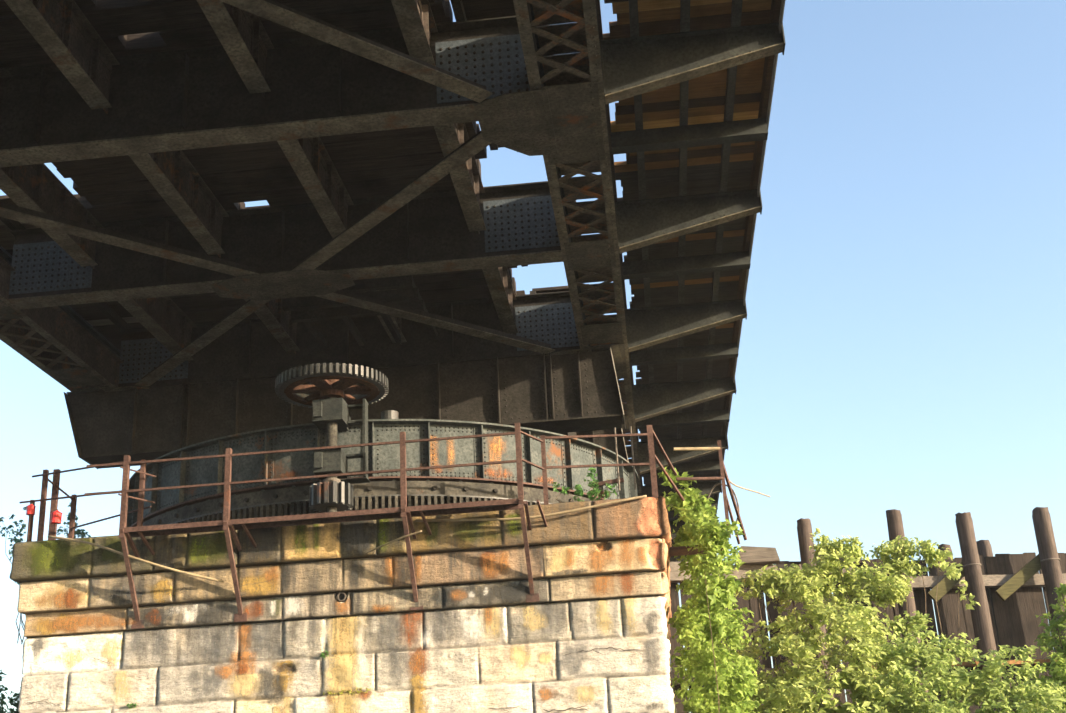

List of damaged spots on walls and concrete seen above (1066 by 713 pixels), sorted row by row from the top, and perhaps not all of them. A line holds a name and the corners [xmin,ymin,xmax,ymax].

corrosion [35,584,130,635]
corrosion [102,640,127,702]
corrosion [150,579,176,625]
corrosion [215,568,277,696]
corrosion [326,601,370,713]
corrosion [404,612,426,713]
corrosion [480,552,509,578]
crack [565,647,638,655]
corrosion [591,539,646,630]